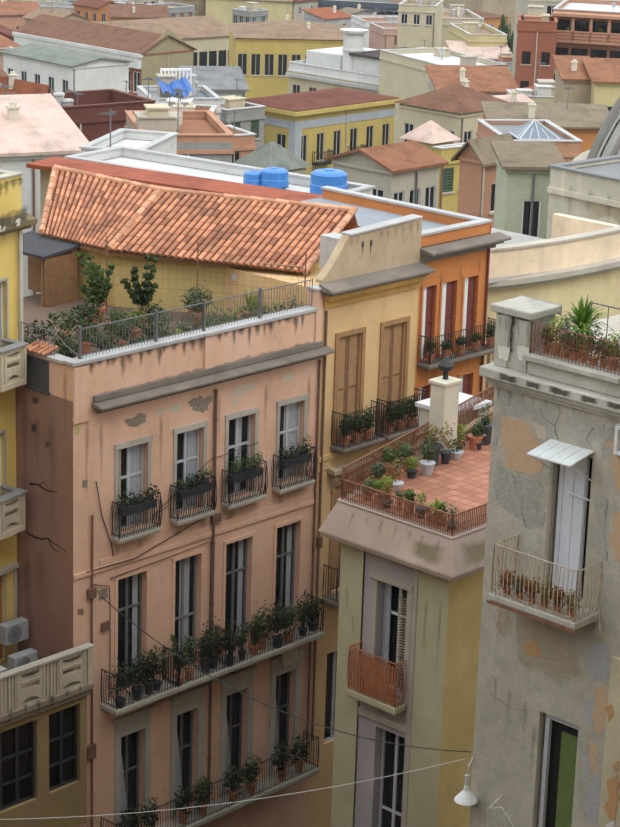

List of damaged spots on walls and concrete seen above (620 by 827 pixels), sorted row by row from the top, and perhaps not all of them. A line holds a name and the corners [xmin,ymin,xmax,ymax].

peeling [157,395,212,414]
peeling [125,413,146,427]
peeling [498,392,620,495]
crack [29,482,56,492]
crack [26,530,67,553]
peeling [603,761,620,827]